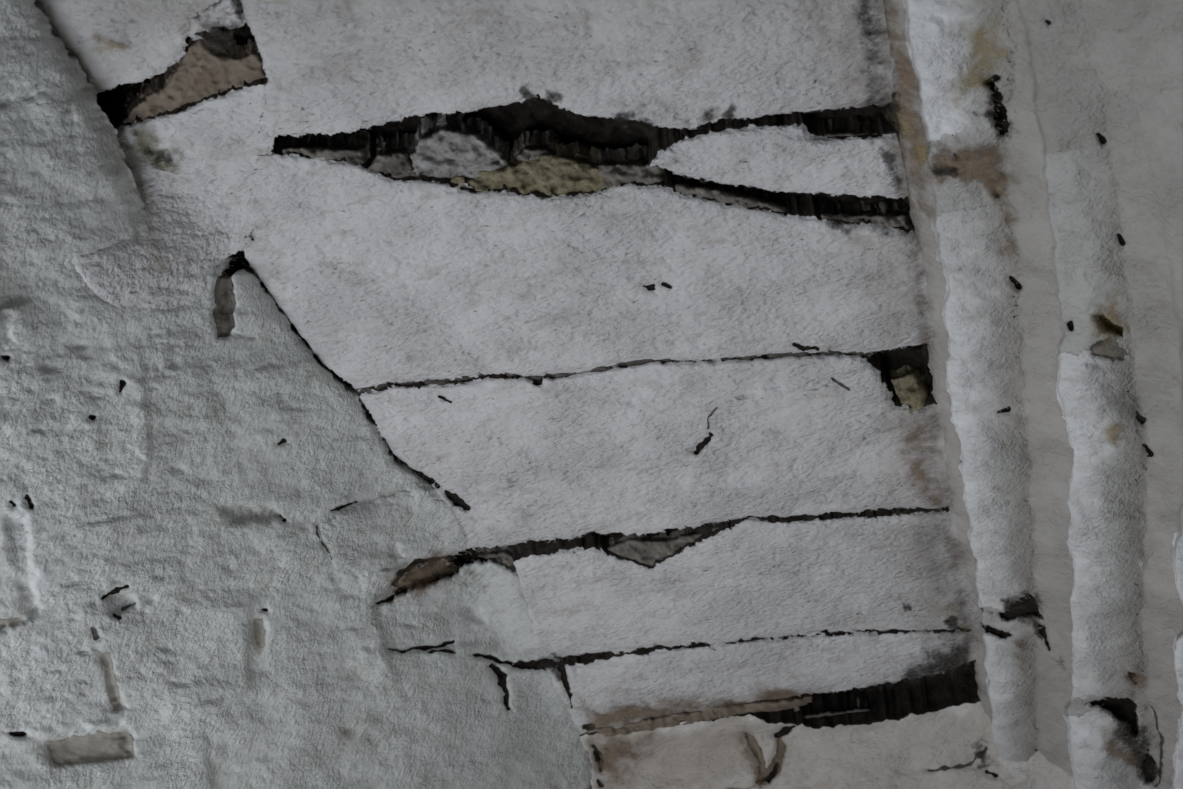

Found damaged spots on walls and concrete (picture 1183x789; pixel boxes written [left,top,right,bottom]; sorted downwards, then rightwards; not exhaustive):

peeling [101,0,266,124]
crack [237,250,873,421]
peeling [878,344,929,413]
crack [694,407,717,455]
crack [391,450,470,510]
crack [315,501,357,560]
crack [376,543,522,605]
crack [605,523,718,566]
crack [981,594,1050,651]
crack [388,640,977,788]
flaking render [47,730,133,765]
crack [927,746,998,778]